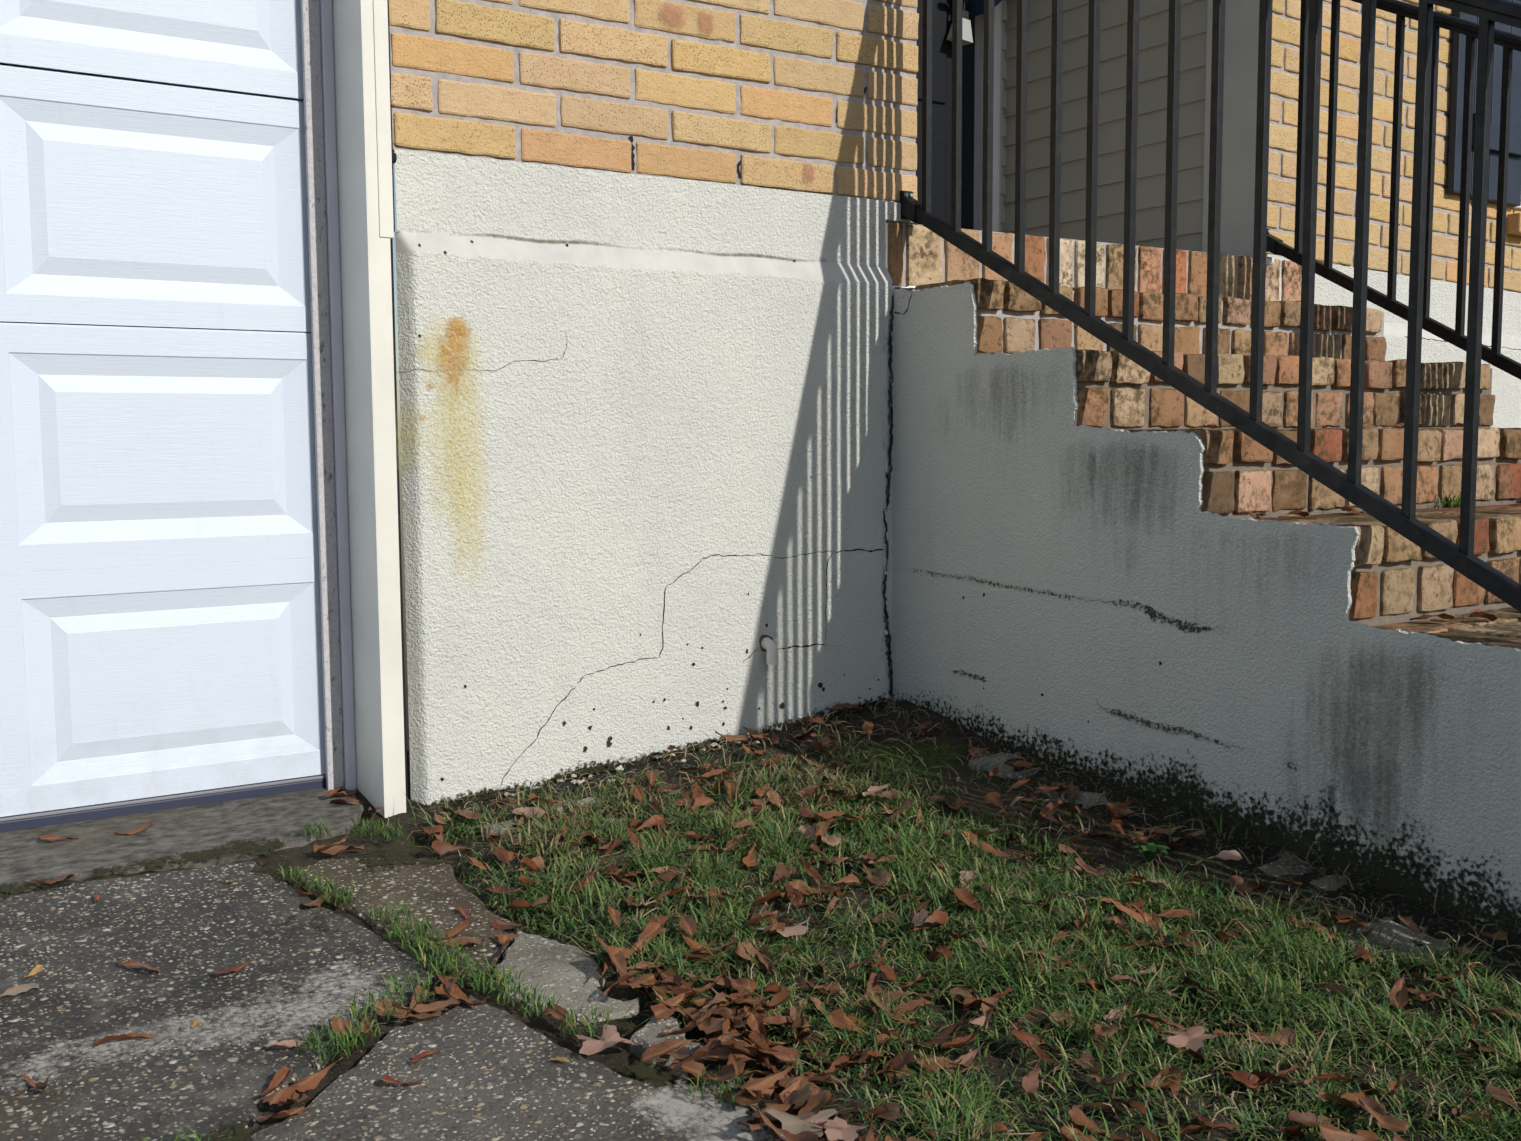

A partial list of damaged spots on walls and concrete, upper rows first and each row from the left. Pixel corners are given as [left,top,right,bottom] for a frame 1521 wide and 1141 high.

corrosion [442,319,467,381]
crack [499,292,1229,788]
crack [1097,702,1300,770]